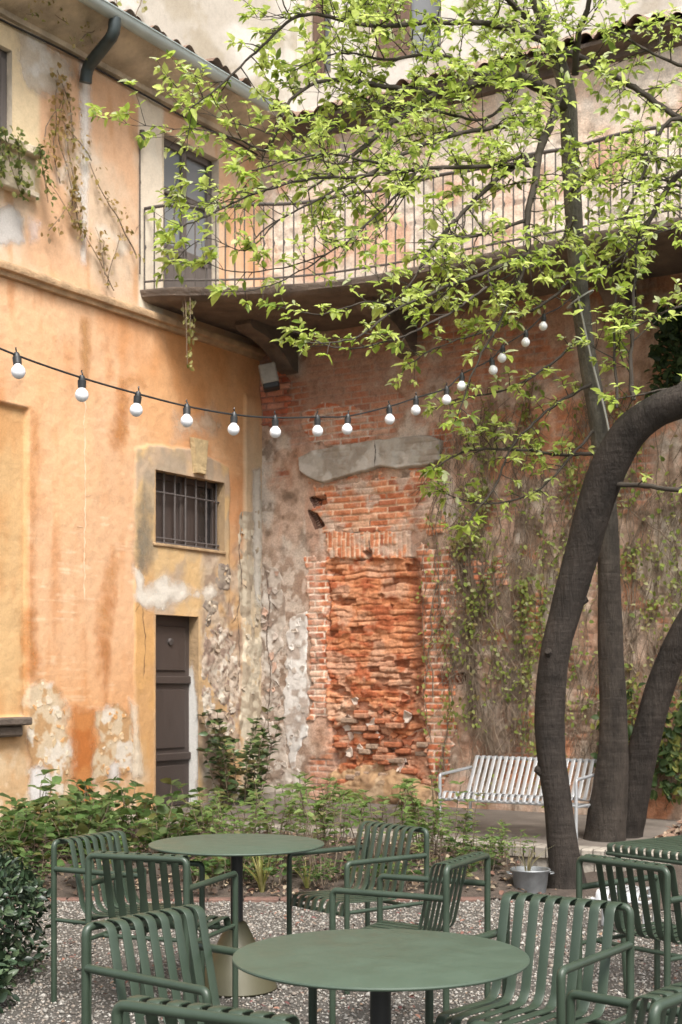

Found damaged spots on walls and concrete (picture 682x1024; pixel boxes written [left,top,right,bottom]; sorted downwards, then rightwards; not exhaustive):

damp [138,504,150,566]
spalling [135,468,546,803]
peeling [22,680,72,806]
damp [73,709,96,802]
peeling [92,704,136,783]